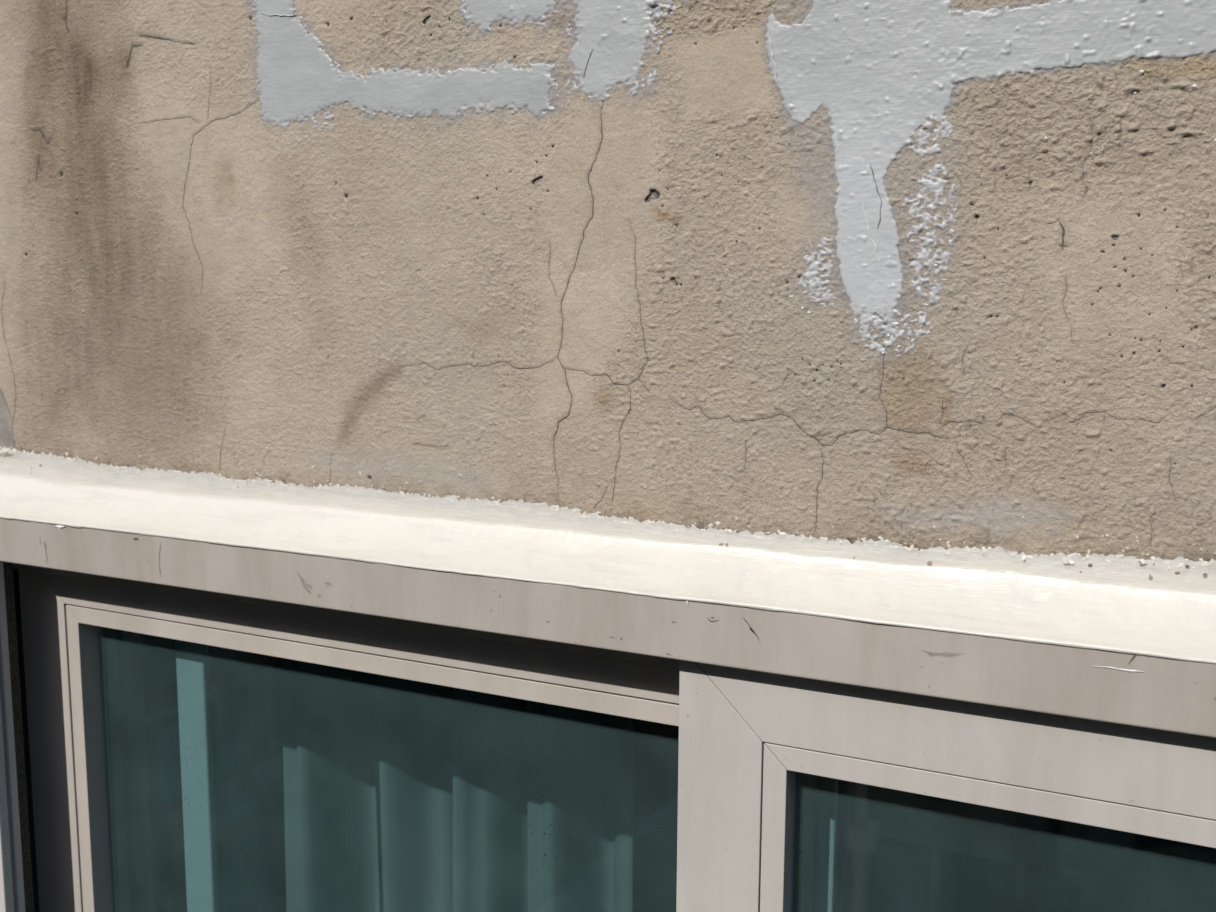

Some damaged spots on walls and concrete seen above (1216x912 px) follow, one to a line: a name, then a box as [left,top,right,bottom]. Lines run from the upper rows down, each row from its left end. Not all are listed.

crack [143,73,259,291]
peeling [0,389,15,450]
crack [404,106,1162,530]